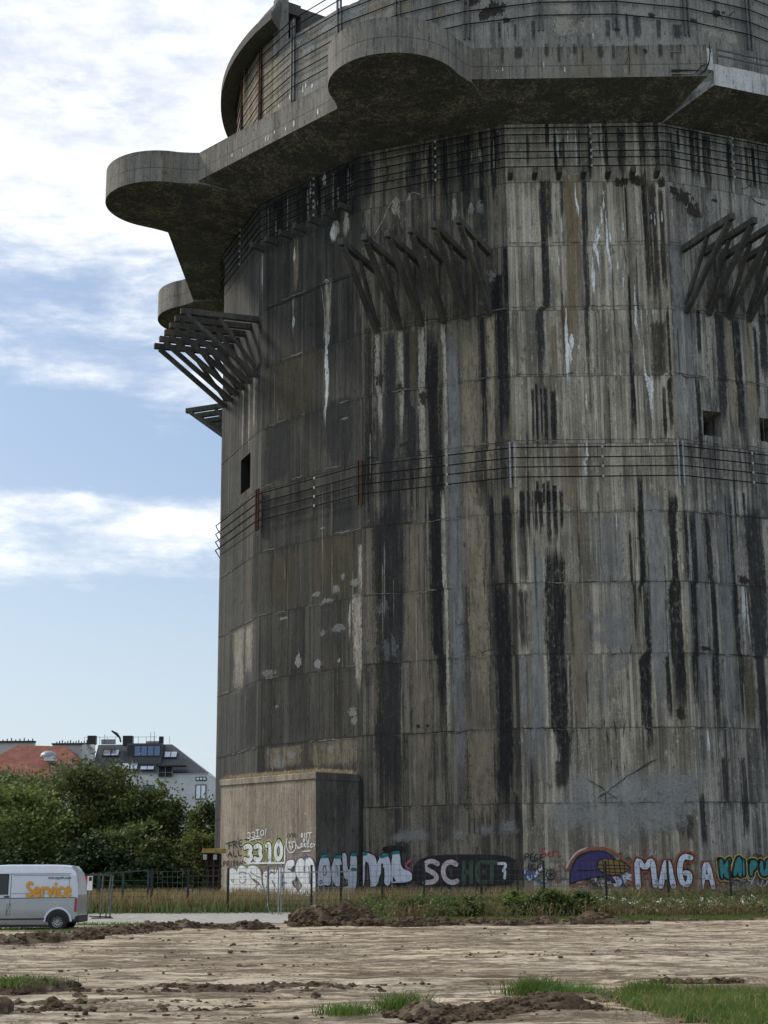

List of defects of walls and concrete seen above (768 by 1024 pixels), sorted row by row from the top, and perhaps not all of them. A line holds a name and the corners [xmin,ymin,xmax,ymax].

damp [242,254,299,503]
damp [324,280,351,470]
damp [331,122,768,830]
peeling [295,654,321,669]
peeling [313,573,358,606]
damp [675,795,708,844]